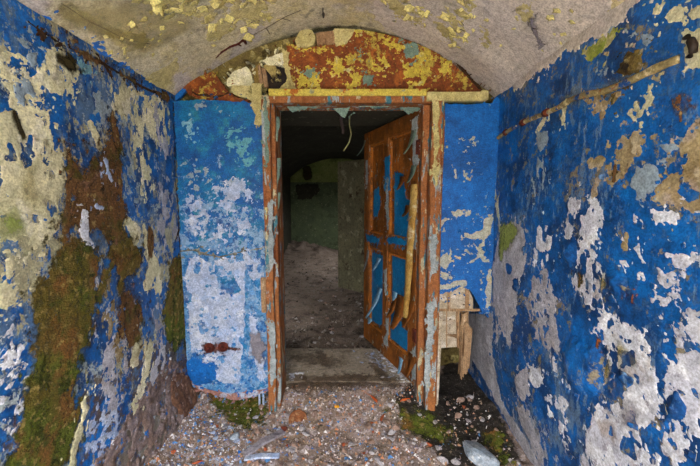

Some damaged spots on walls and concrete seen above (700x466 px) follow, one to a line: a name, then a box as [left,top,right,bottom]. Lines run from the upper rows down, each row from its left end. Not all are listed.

damp [7,222,145,466]
peeling [0,0,286,466]
rust [196,342,241,357]
peeling [262,0,700,466]
damp [499,213,517,261]